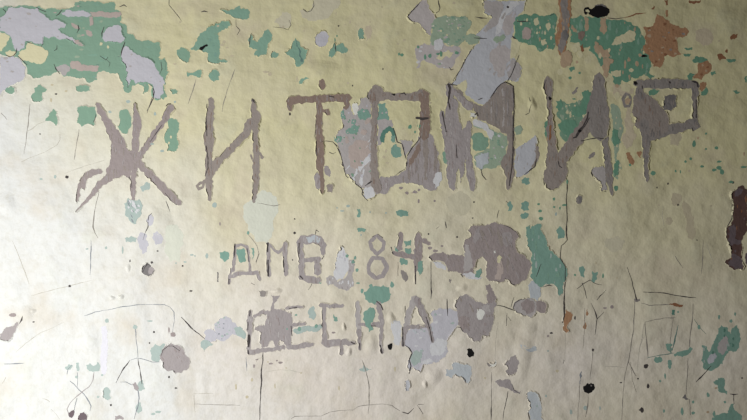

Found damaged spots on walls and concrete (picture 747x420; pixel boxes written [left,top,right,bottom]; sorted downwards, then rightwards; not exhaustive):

peeling [0,0,178,106]
peeling [285,0,708,200]
spalling [150,342,191,374]
spalling [200,201,569,391]
crack [524,159,606,333]
peeling [701,325,741,371]